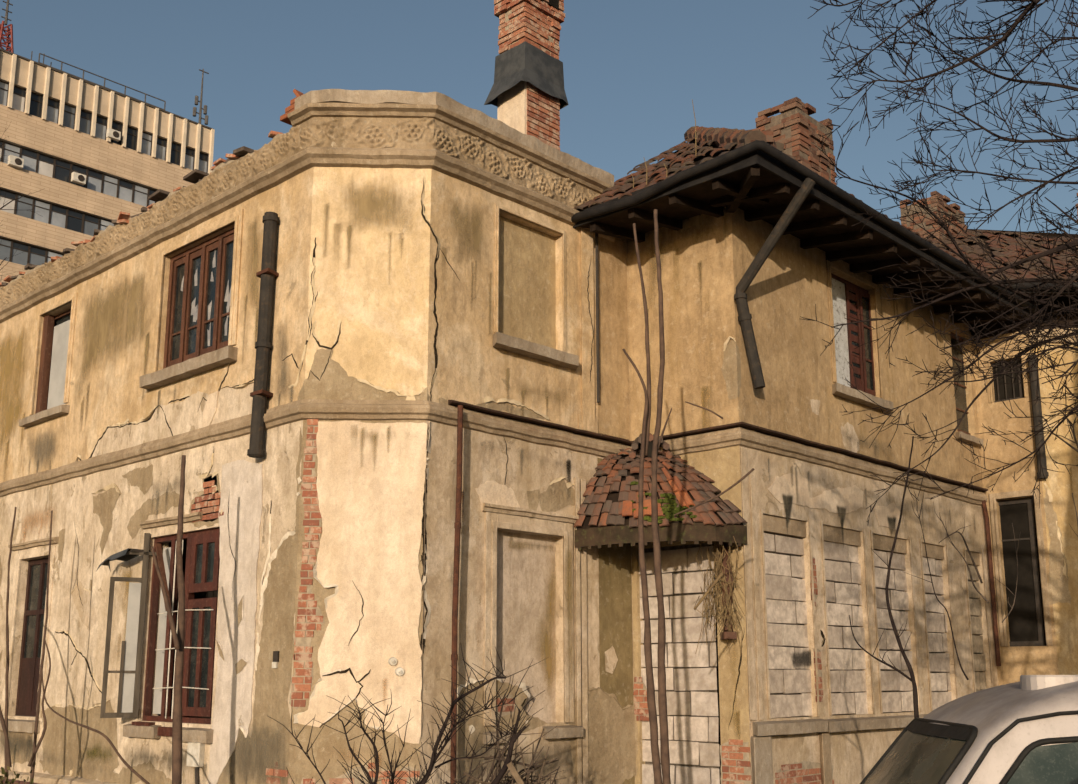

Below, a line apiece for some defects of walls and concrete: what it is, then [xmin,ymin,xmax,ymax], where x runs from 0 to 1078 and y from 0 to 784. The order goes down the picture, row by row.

water stain [347,189,399,254]
water stain [0,336,54,473]
water stain [82,278,149,376]
crack [75,363,254,462]
crack [282,237,341,389]
spalling [298,349,552,422]
crack [419,176,459,658]
crack [55,523,102,693]
peeling [91,419,428,784]
crack [321,580,371,698]
peeling [605,646,618,674]
spalling [569,676,649,784]